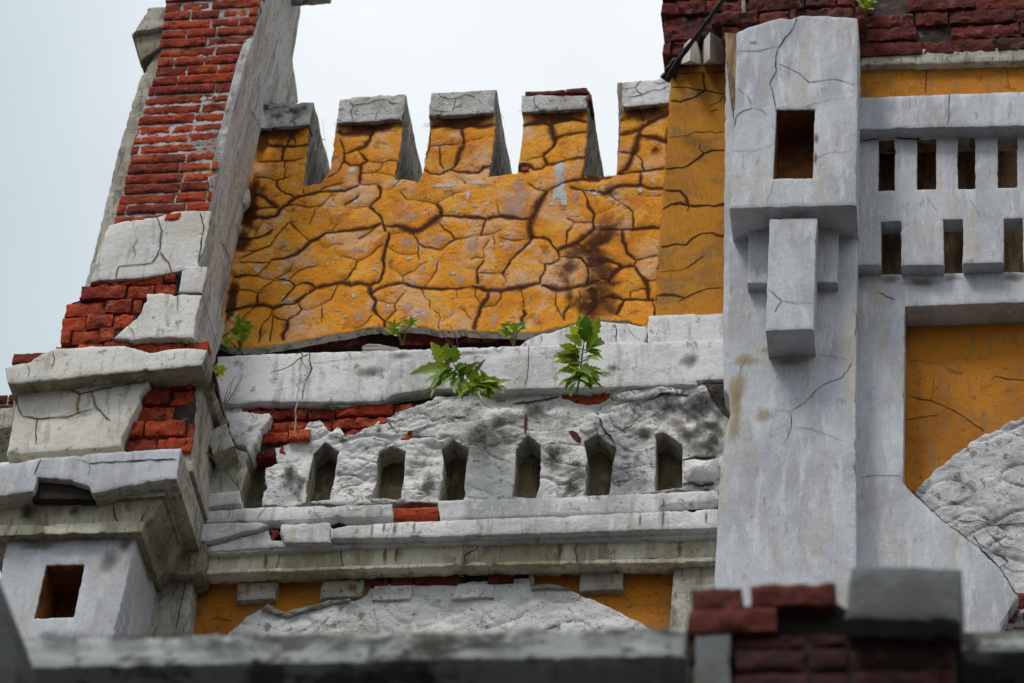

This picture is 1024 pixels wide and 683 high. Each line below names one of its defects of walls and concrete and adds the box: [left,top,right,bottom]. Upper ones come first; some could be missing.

flaking render [549,162,599,206]
crack [198,18,855,444]
crack [116,215,178,336]
peeling [383,302,430,319]
crack [17,381,146,474]
spalling [243,394,468,471]
spalling [562,386,688,415]
spalling [703,382,730,419]
crack [906,360,1013,469]
flaking render [914,417,1024,632]
flaking render [227,574,647,637]